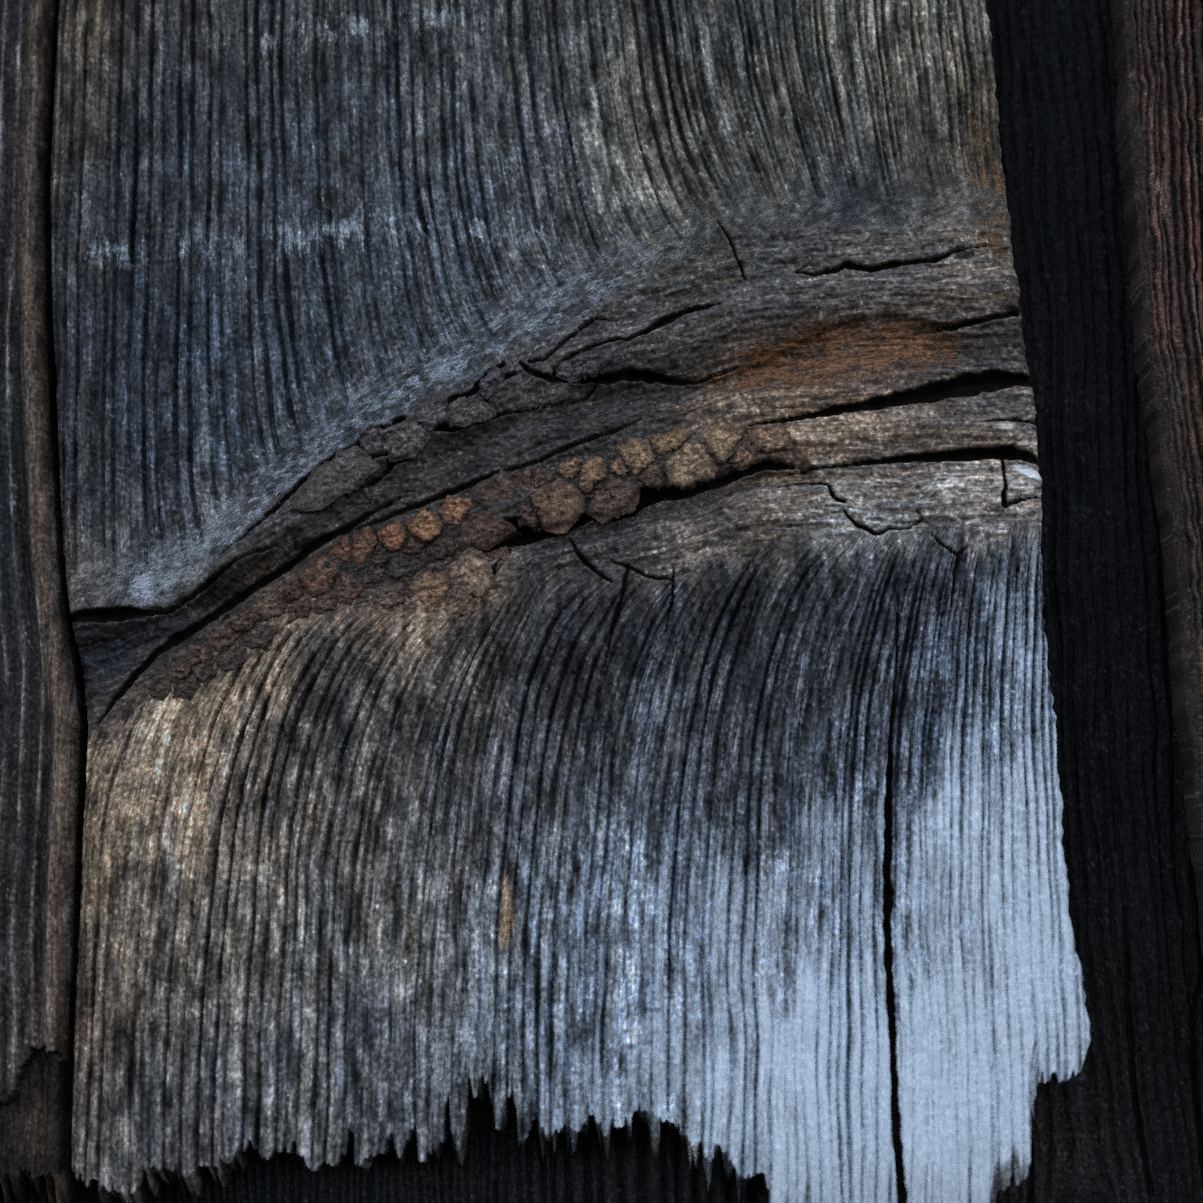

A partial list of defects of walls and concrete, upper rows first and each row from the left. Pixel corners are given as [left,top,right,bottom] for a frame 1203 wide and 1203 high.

crack [717,221,746,280]
crack [796,246,985,277]
crack [915,312,1016,335]
crack [74,304,740,724]
crack [474,372,1038,676]
crack [883,595,907,1203]